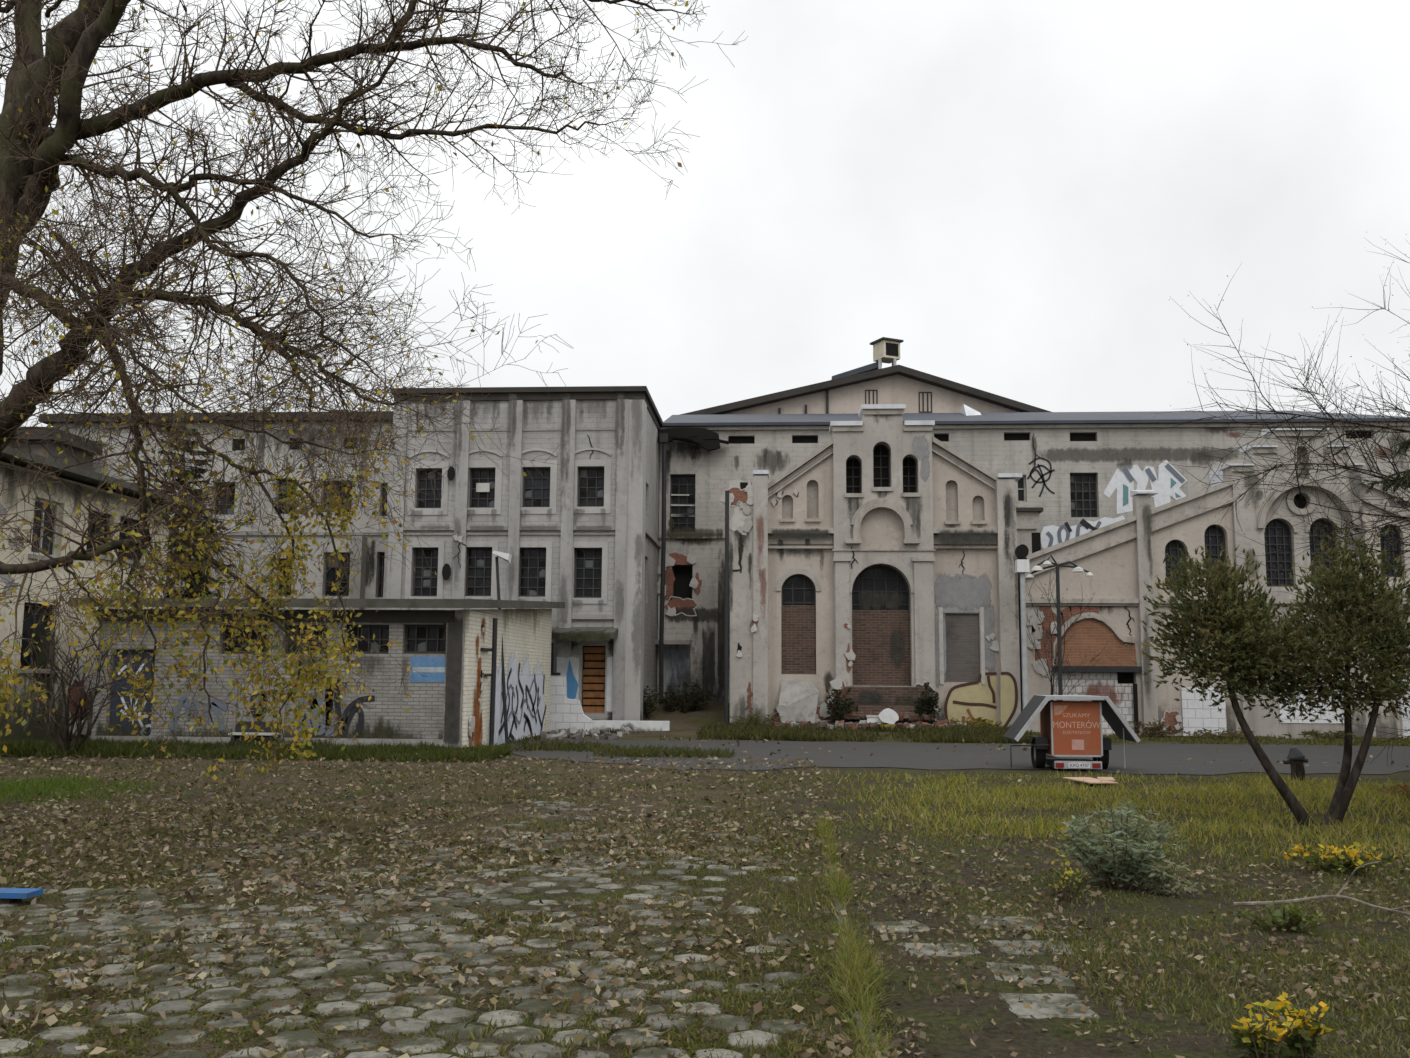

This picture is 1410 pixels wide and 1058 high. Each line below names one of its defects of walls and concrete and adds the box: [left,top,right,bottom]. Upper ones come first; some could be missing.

peeling [719,484,753,535]
spalling [657,552,702,617]
spalling [1027,596,1137,677]
rust [474,618,486,747]